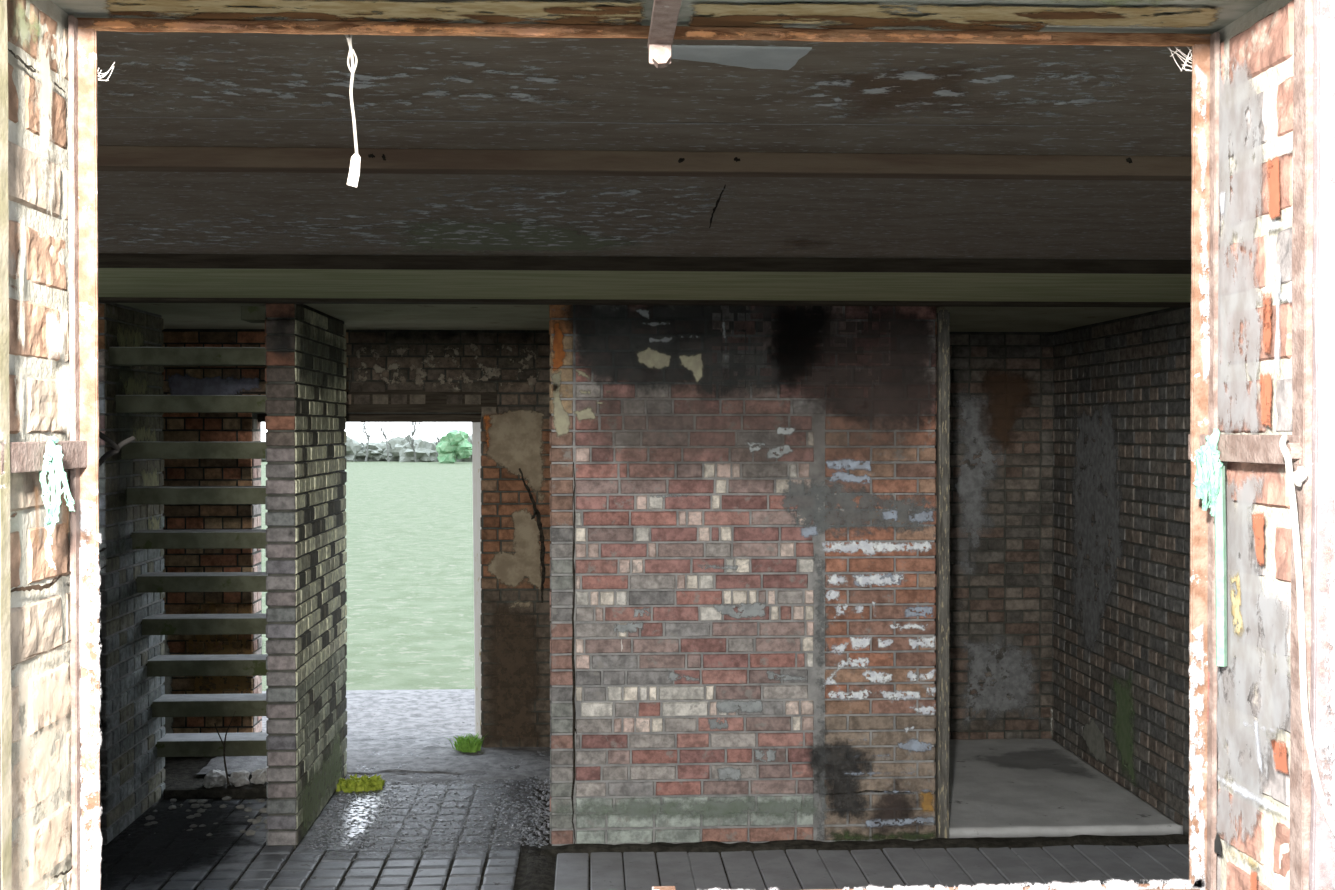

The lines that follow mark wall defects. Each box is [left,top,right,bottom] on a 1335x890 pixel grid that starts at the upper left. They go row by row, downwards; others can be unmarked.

crack [709,185,726,228]
peeling [1195,54,1280,434]
peeling [636,309,703,382]
peeling [486,409,544,608]
peeling [826,459,871,484]
peeling [801,526,931,555]
peeling [826,573,904,618]
peeling [79,500,102,890]
peeling [825,606,936,733]
peeling [843,475,1290,890]
leakage [808,739,935,834]